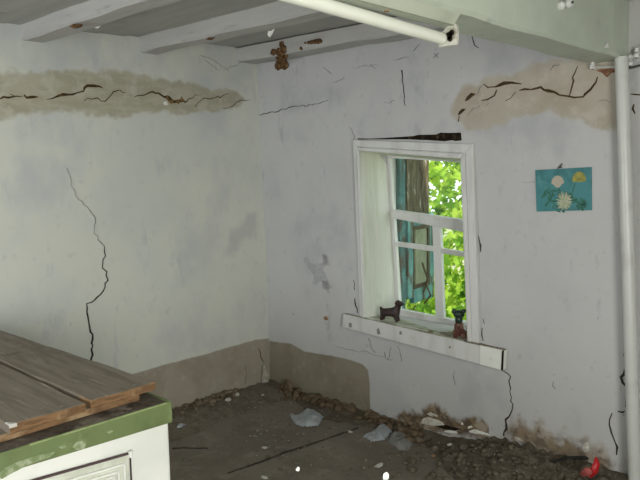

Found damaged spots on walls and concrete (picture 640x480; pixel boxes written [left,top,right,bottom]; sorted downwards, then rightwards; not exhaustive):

corrosion [270,41,289,70]
crack [0,84,248,109]
crack [458,66,610,122]
crack [67,169,109,360]
flaking render [421,412,492,436]
crack [503,371,514,436]
crack [609,354,626,455]